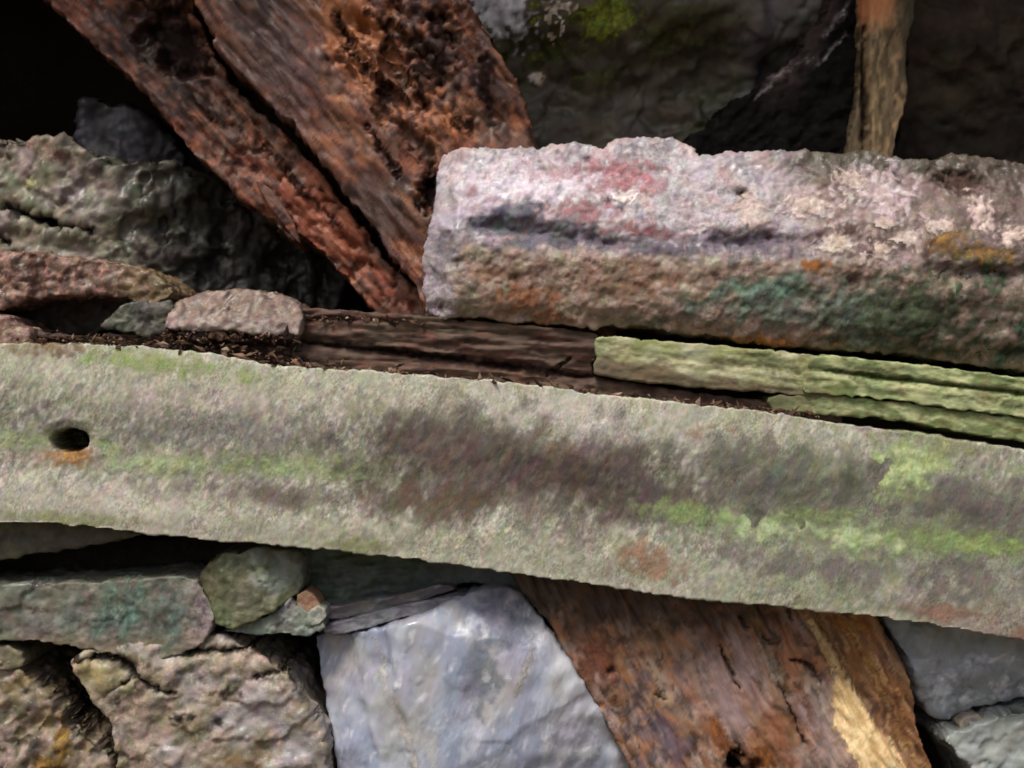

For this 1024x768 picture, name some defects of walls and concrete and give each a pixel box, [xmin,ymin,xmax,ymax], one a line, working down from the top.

corrosion [43,446,93,464]